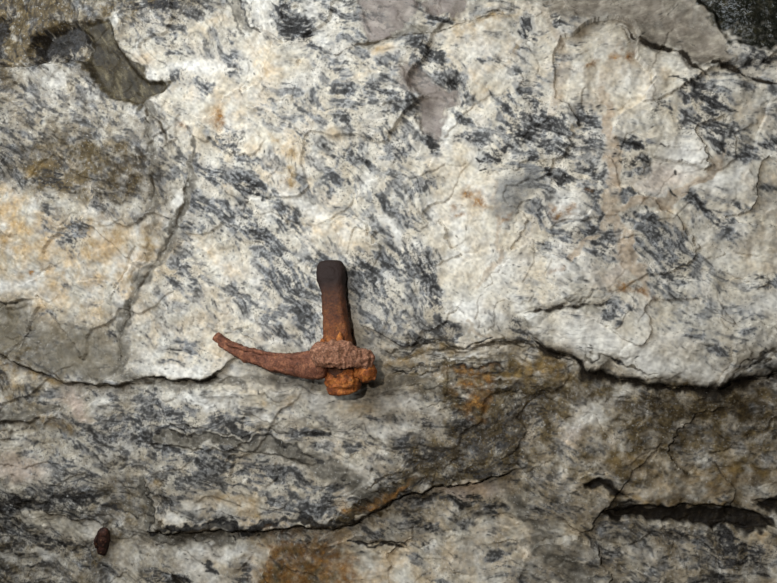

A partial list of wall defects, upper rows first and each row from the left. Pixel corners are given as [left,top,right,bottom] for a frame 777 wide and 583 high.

spalling [360,0,466,41]
spalling [550,0,738,66]
crack [145,107,166,139]
spalling [399,64,457,140]
crack [163,180,188,251]
crack [528,300,608,312]
crack [0,354,222,388]
crack [406,340,776,400]
crack [154,483,471,547]